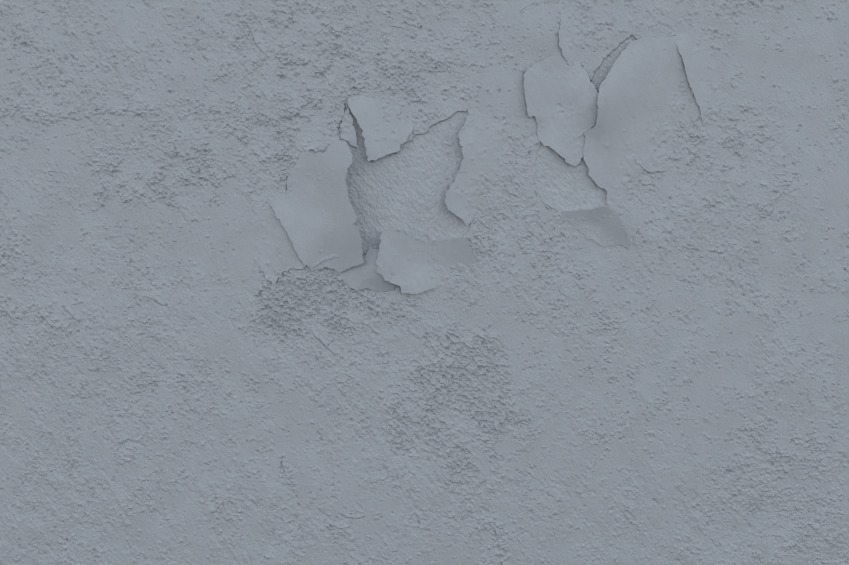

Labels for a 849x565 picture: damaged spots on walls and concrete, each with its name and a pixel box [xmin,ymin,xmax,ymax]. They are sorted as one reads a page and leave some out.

peeling [253,95,517,295]
peeling [523,10,727,250]